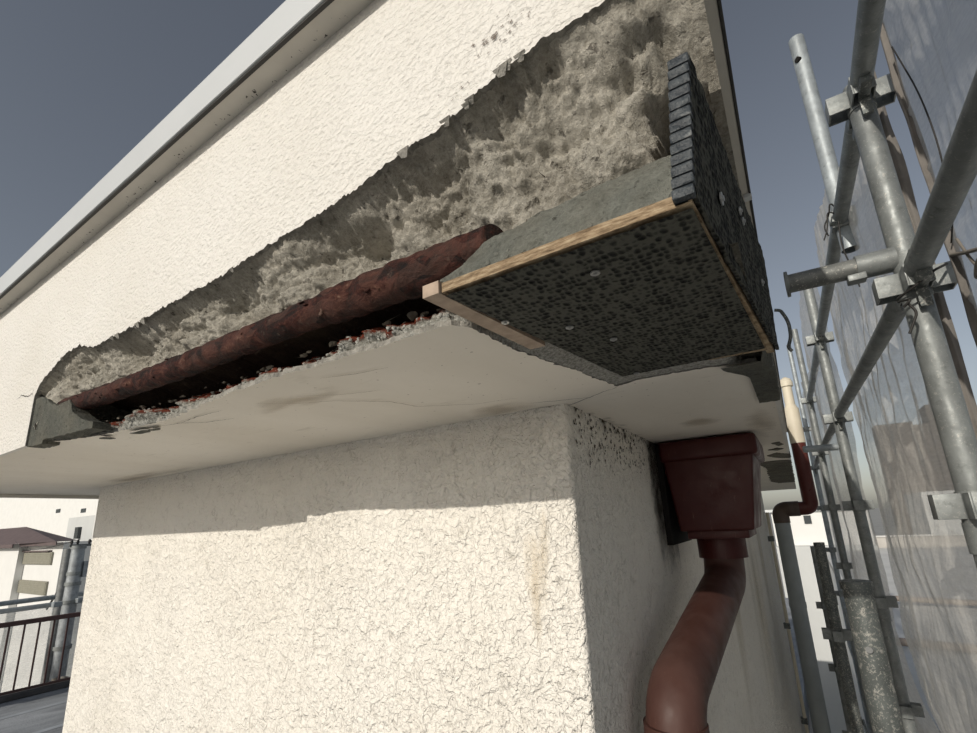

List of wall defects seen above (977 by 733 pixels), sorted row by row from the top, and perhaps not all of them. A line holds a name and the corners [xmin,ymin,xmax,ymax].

spalling [40,0,740,403]
corrosion [101,309,446,437]
spalling [47,297,774,441]
mould [573,407,649,478]